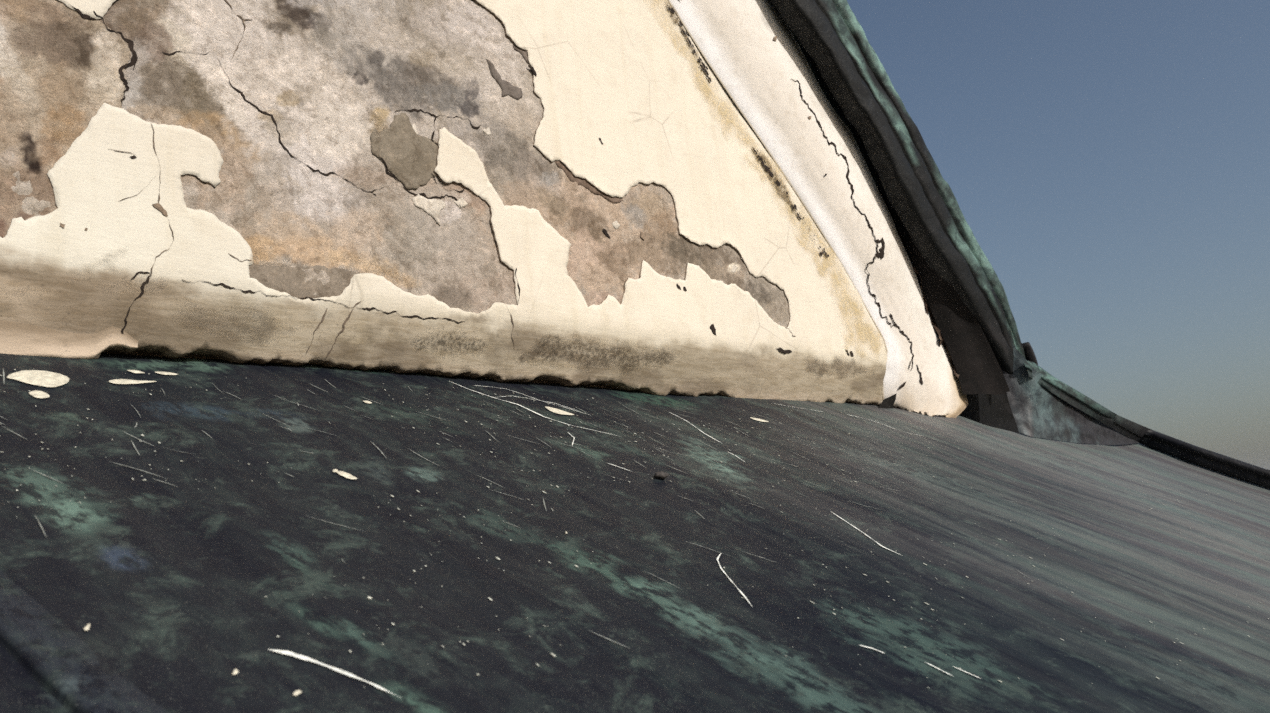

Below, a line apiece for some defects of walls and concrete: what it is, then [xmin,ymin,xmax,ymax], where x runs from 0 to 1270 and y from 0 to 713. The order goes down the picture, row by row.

crack [111,123,174,334]
crack [68,0,464,207]
crack [182,254,465,358]
peeling [0,0,789,327]
crack [395,108,481,145]
spalling [753,148,829,258]
crack [792,79,923,385]